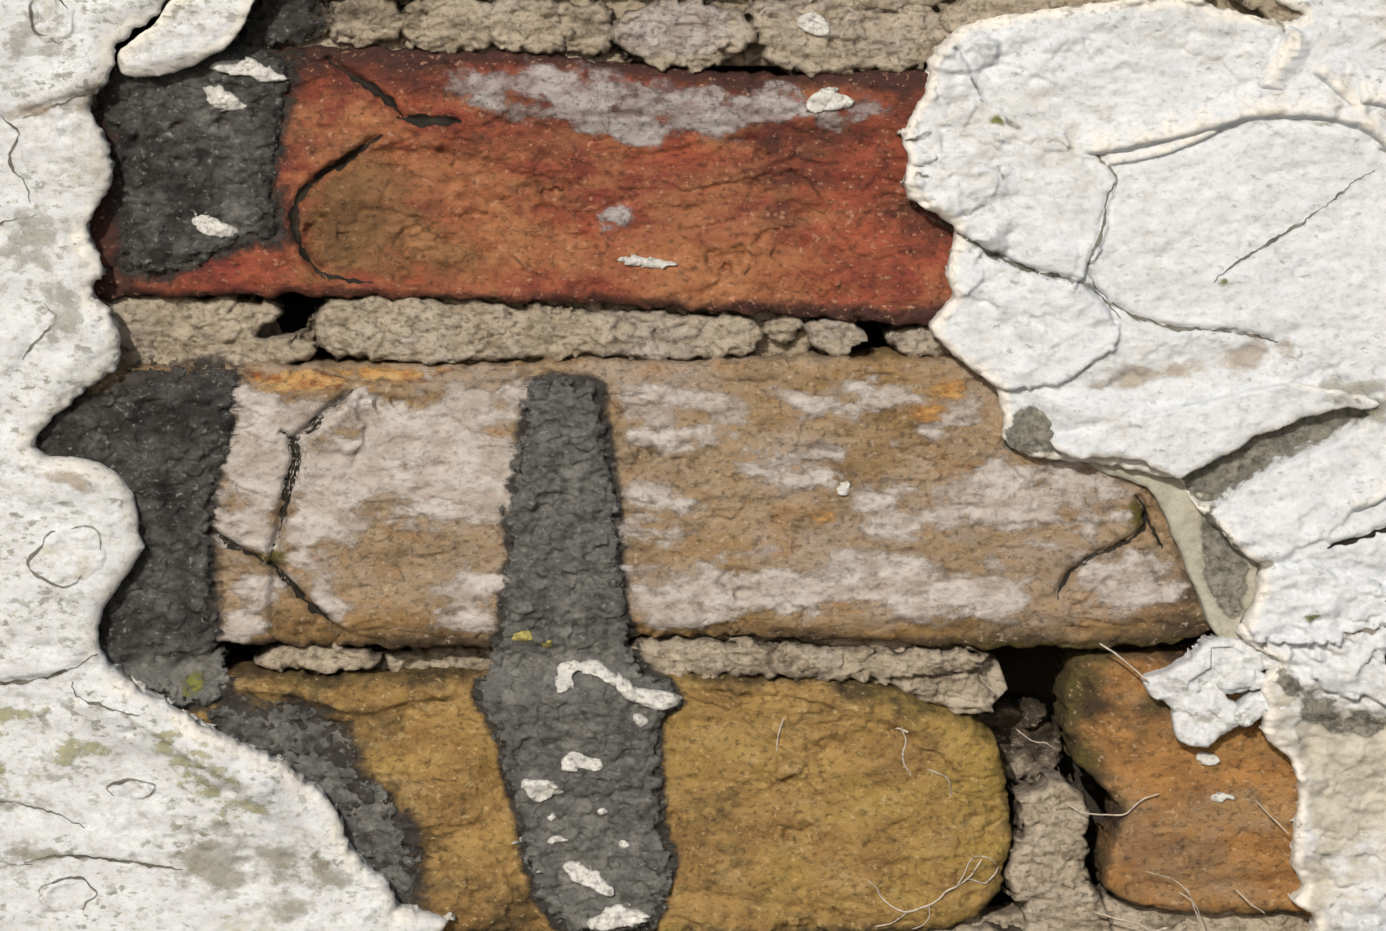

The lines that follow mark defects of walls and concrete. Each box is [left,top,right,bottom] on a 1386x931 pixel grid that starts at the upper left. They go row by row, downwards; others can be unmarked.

peeling [617,254,678,269]
crack [924,183,1278,343]
crack [1214,170,1375,283]
flaking render [0,0,480,931]
crack [206,389,353,623]
peeling [837,481,851,496]
crack [1057,494,1163,600]
flaking render [896,0,1386,931]
crack [1327,526,1386,549]
crack [0,801,183,870]